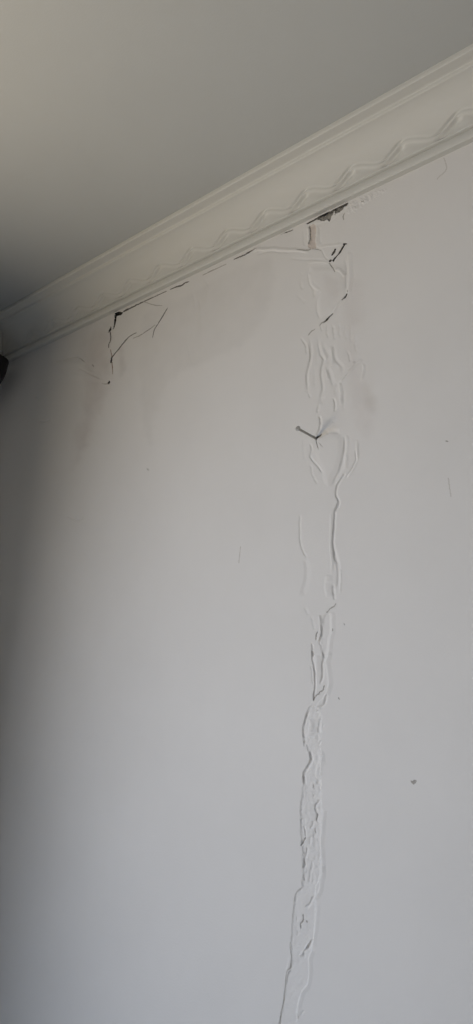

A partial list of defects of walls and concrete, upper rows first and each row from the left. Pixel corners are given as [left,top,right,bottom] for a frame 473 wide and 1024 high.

peeling [302,188,387,249]
crack [107,248,256,374]
crack [310,603,338,710]
crack [280,942,292,1024]